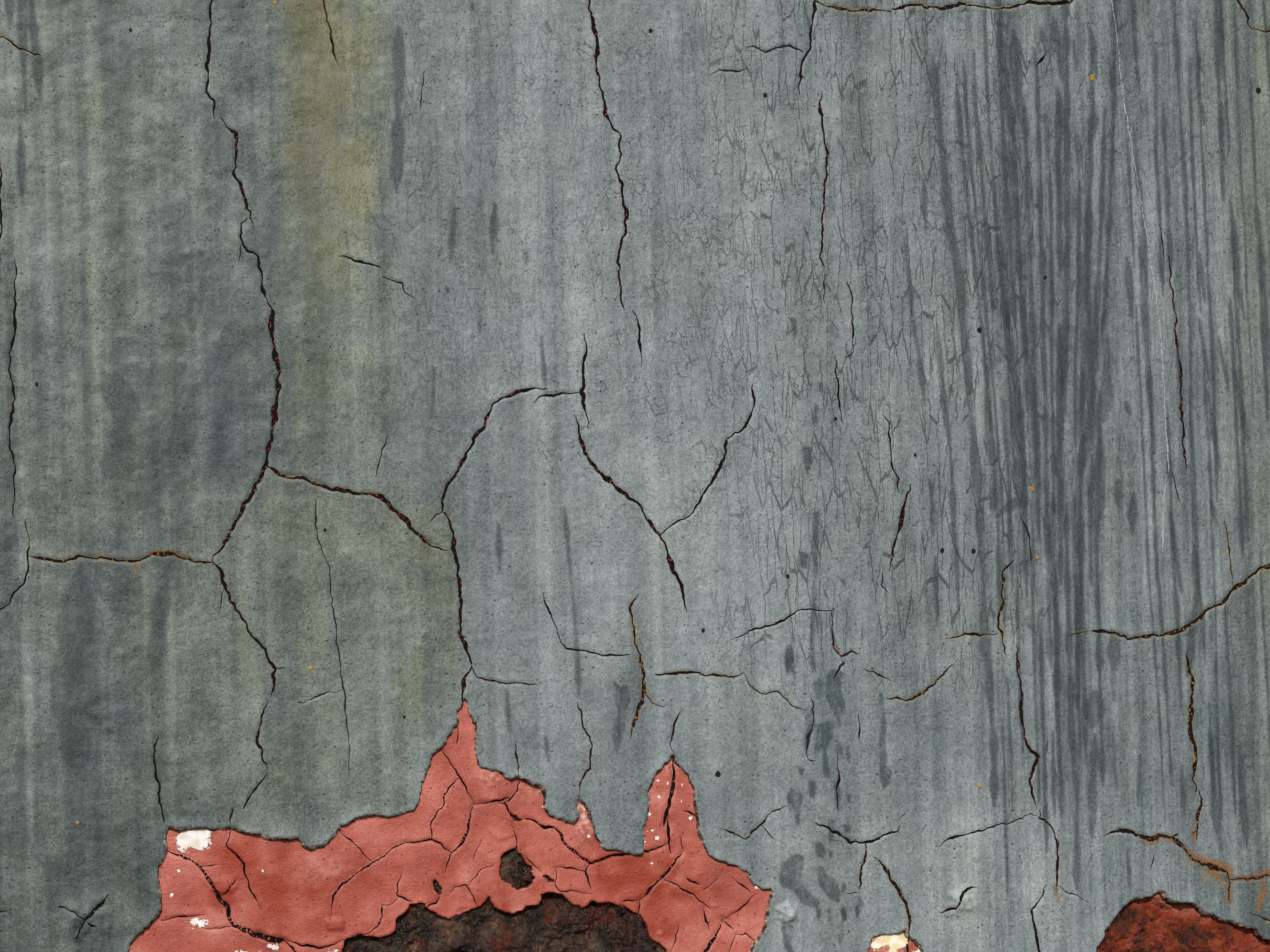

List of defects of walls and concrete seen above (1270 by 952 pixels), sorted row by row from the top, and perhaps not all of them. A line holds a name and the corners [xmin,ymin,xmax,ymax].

crack [0,0,756,823]
crack [710,0,1073,422]
damp [940,0,1139,846]
damp [1125,59,1269,550]
peeling [129,701,770,952]
corrosion [342,847,665,952]
crack [542,518,1088,952]
peeling [867,931,921,952]
crack [1068,521,1270,921]
corrosion [1096,893,1270,952]
damp [1147,497,1230,775]
damp [1210,701,1248,843]